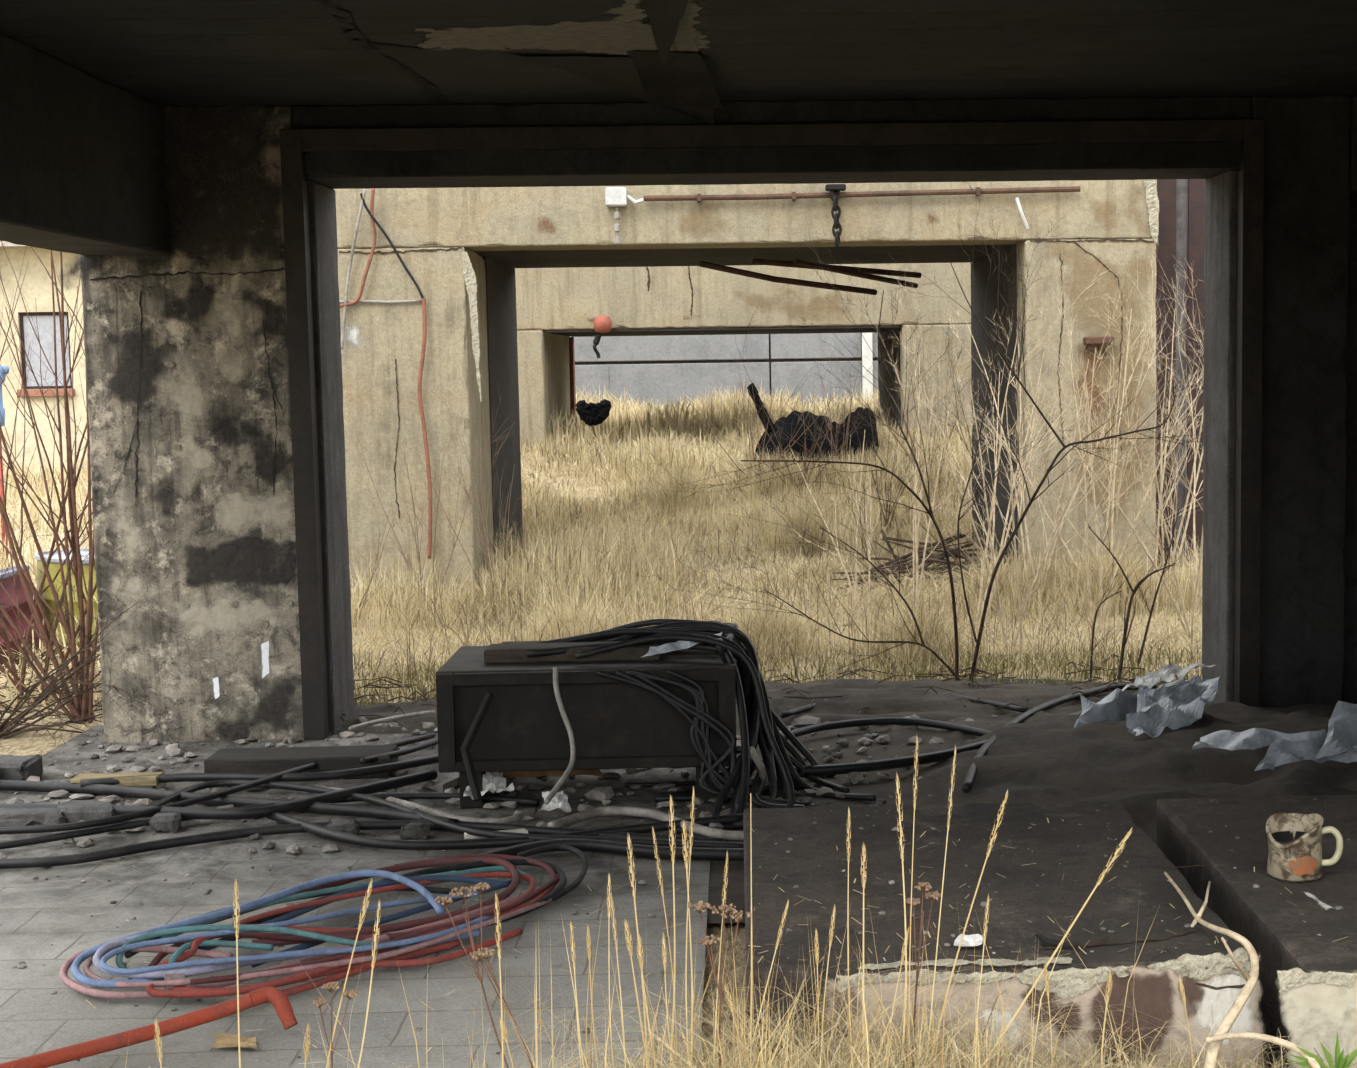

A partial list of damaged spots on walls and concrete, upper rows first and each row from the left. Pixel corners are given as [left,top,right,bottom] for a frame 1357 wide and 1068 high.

peeling [414,0,722,125]
leakage [163,286,215,332]
leakage [243,292,288,343]
leakage [108,332,165,412]
crack [90,268,285,498]
leakage [212,417,293,490]
leakage [157,481,173,516]
leakage [185,536,297,587]